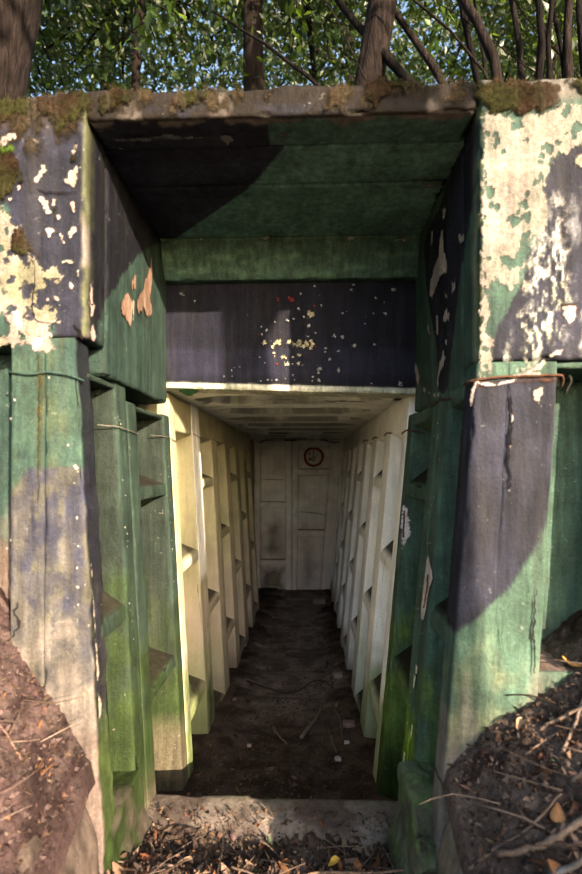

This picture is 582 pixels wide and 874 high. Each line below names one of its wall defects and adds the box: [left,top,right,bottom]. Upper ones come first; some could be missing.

peeling [0,133,16,146]
peeling [64,165,78,187]
peeling [0,185,79,353]
peeling [121,258,152,326]
peeling [429,230,447,297]
peeling [470,102,582,404]
peeling [258,293,340,382]
peeling [415,309,450,397]
crack [506,384,514,489]
spalling [400,505,411,546]
spalling [418,556,433,620]